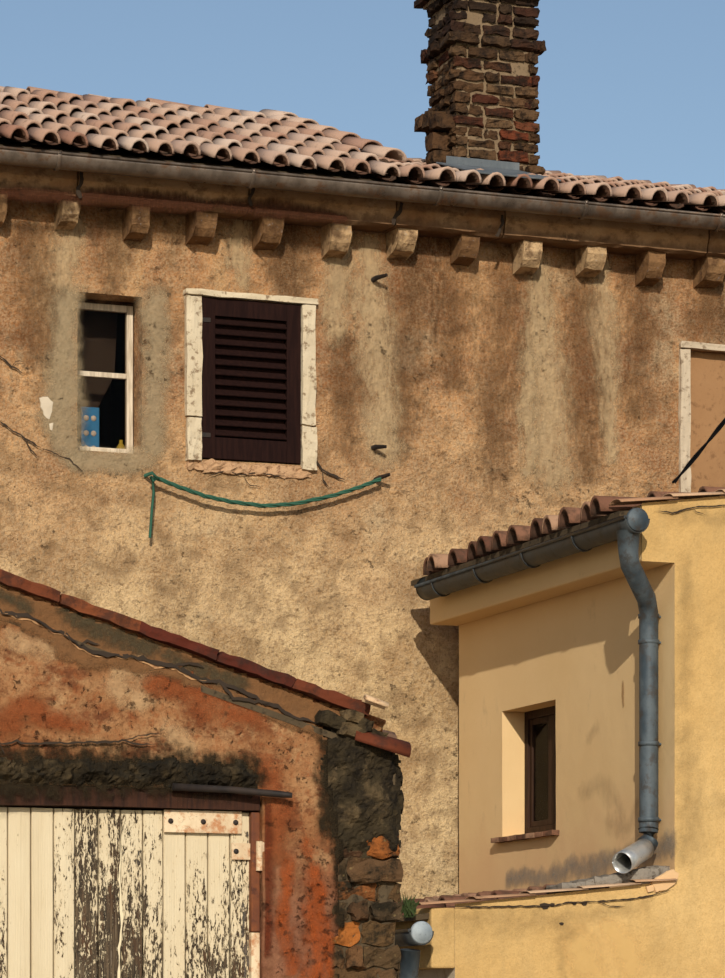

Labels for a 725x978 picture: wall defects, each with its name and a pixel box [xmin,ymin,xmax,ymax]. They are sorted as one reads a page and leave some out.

crack [0,356,23,373]
water stain [517,253,573,489]
water stain [589,259,622,463]
spalling [39,397,53,430]
crack [0,422,83,472]
crack [661,505,725,515]
crack [0,609,323,727]
water stain [0,743,266,801]
water stain [506,855,612,885]